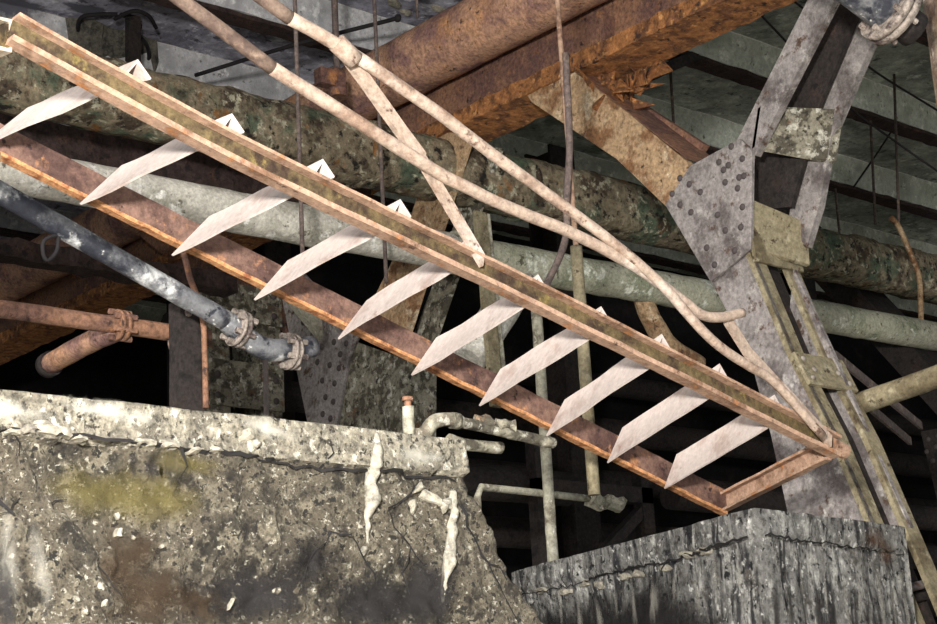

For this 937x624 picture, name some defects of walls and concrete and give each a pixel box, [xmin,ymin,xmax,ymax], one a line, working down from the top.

crack [0,427,457,595]
crack [460,505,909,623]